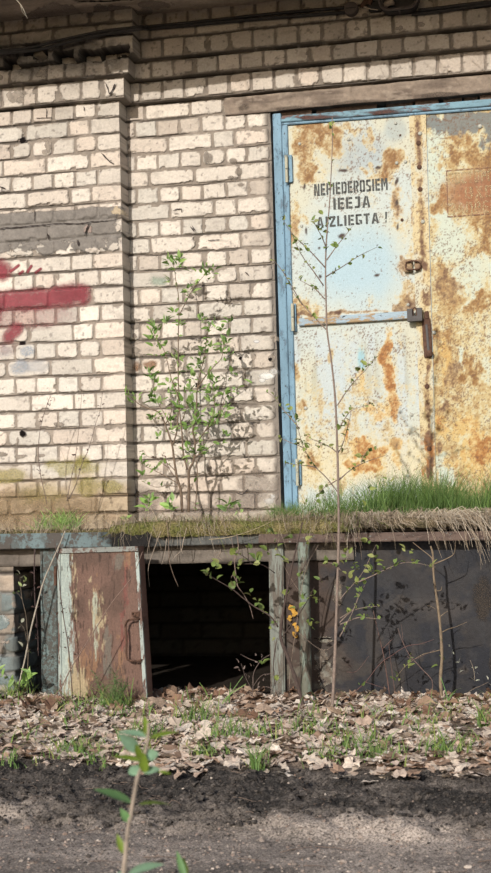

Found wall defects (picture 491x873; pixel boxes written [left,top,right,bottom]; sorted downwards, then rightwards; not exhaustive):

crack [75,0,132,8]
spalling [0,206,126,256]